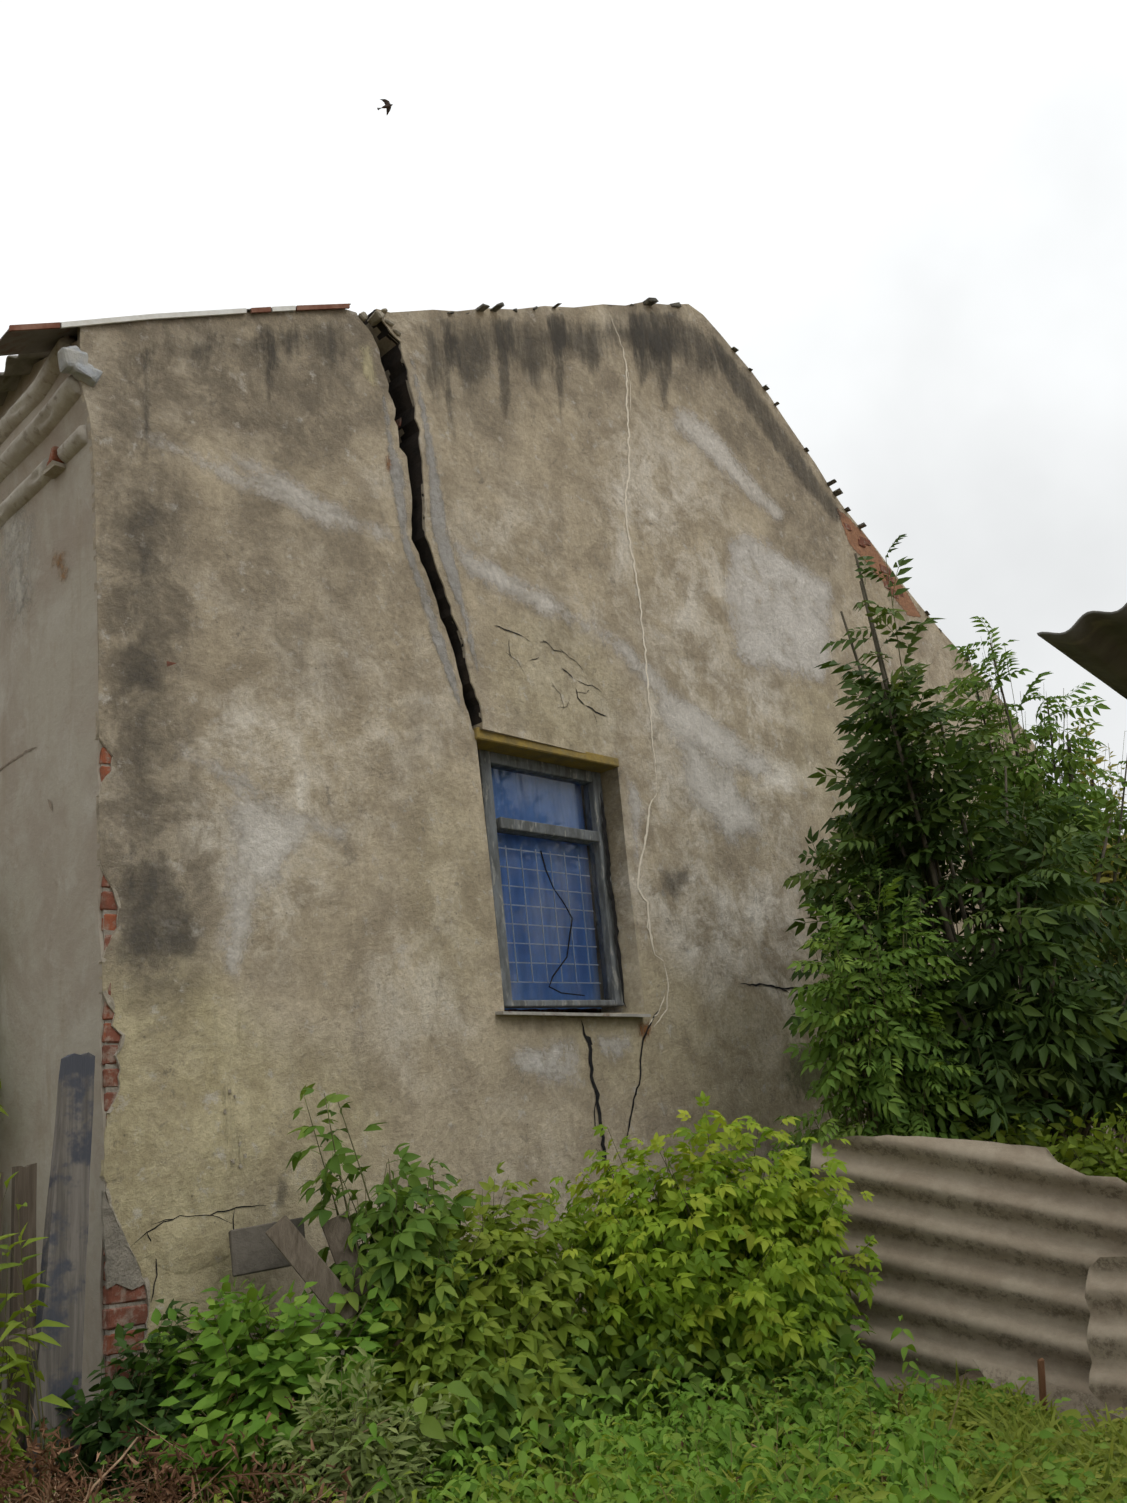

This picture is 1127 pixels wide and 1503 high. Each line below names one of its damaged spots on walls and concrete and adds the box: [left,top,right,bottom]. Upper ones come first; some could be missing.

crack [358,308,605,726]
leakage [430,315,838,519]
crack [581,316,669,1186]
flaking render [99,983,125,1113]
crack [135,1220,172,1301]
crack [210,1205,267,1230]